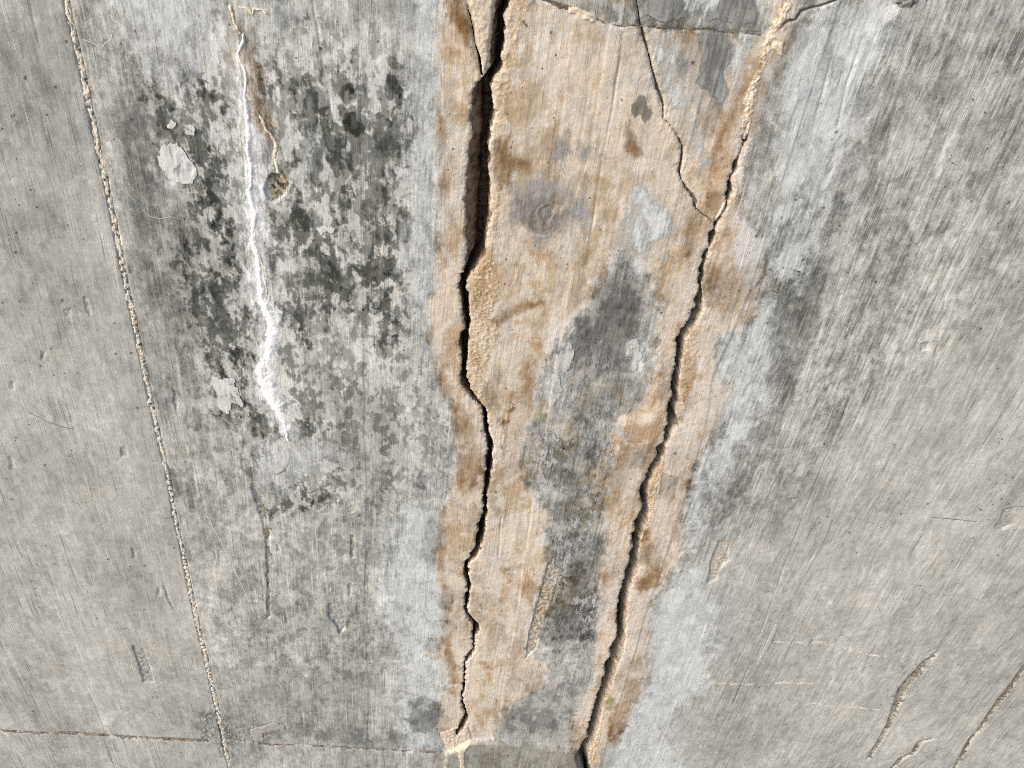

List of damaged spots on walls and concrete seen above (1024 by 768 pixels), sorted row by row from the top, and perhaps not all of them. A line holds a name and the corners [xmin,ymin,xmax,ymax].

leakage [303,91,351,175]
leakage [184,249,216,320]
leakage [192,5,291,475]
leakage [286,201,339,287]
leakage [350,229,429,323]
crack [456,0,529,734]
crack [577,0,748,768]